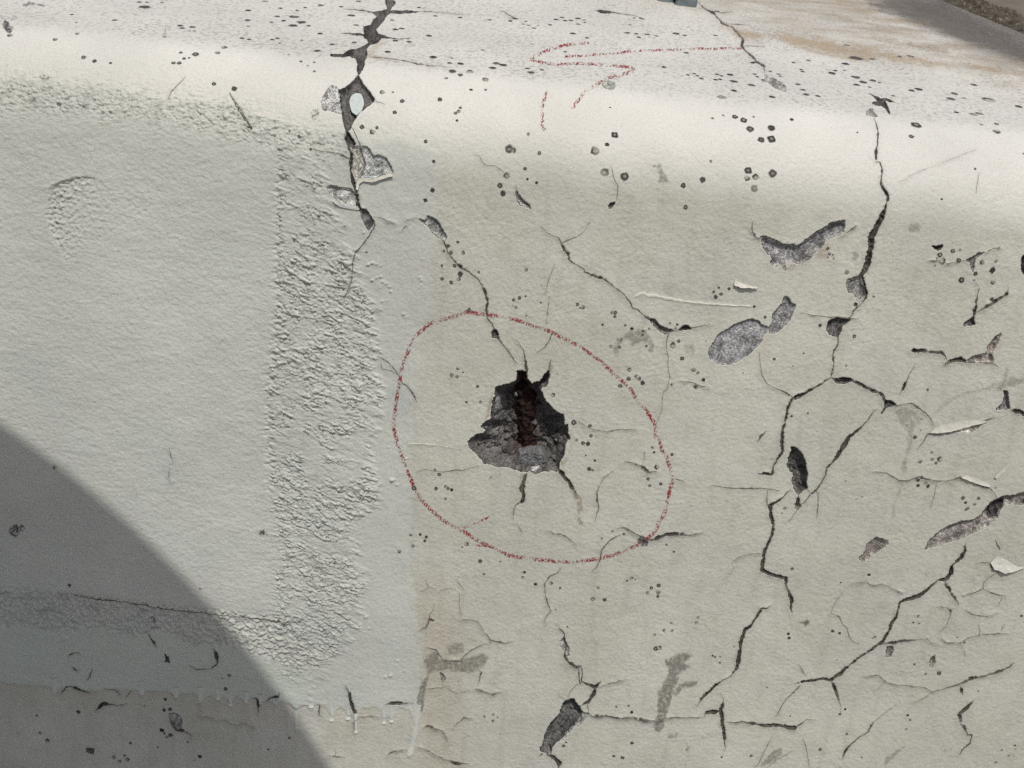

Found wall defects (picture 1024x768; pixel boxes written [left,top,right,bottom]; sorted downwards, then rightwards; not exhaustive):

crack [314,0,513,359]
spalling [751,221,856,271]
spalling [708,296,795,365]
crack [378,356,418,403]
spalling [468,343,577,533]
crack [541,93,1014,768]
spalling [787,447,808,509]
spalling [859,537,888,562]
spalling [925,492,1024,550]
crack [387,580,512,765]
spalling [540,698,589,768]